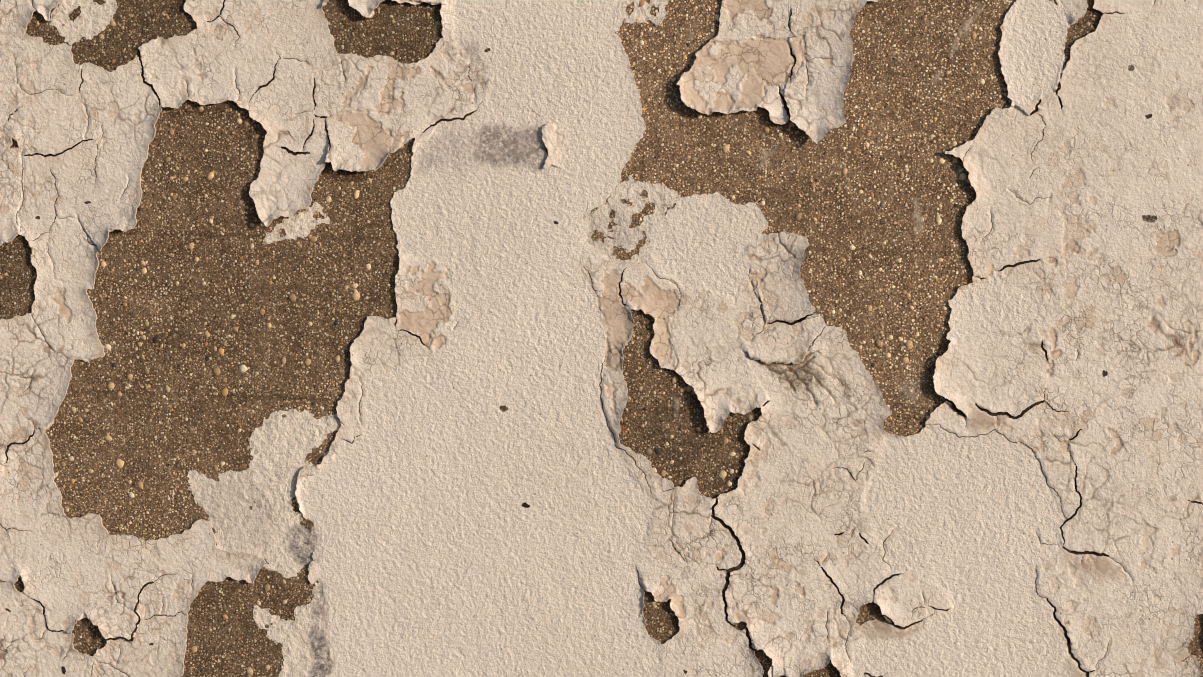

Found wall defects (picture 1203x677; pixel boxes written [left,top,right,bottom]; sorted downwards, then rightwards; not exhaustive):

crack [8,54,104,278]
crack [235,56,347,156]
peeling [0,0,483,546]
peeling [590,0,1103,499]
peeling [14,549,144,656]
crack [0,574,193,677]
peeling [181,559,319,677]
peeling [642,575,686,644]
crack [709,499,757,651]
crack [814,530,949,677]
crack [926,340,1131,677]
peeling [1188,614,1203,677]